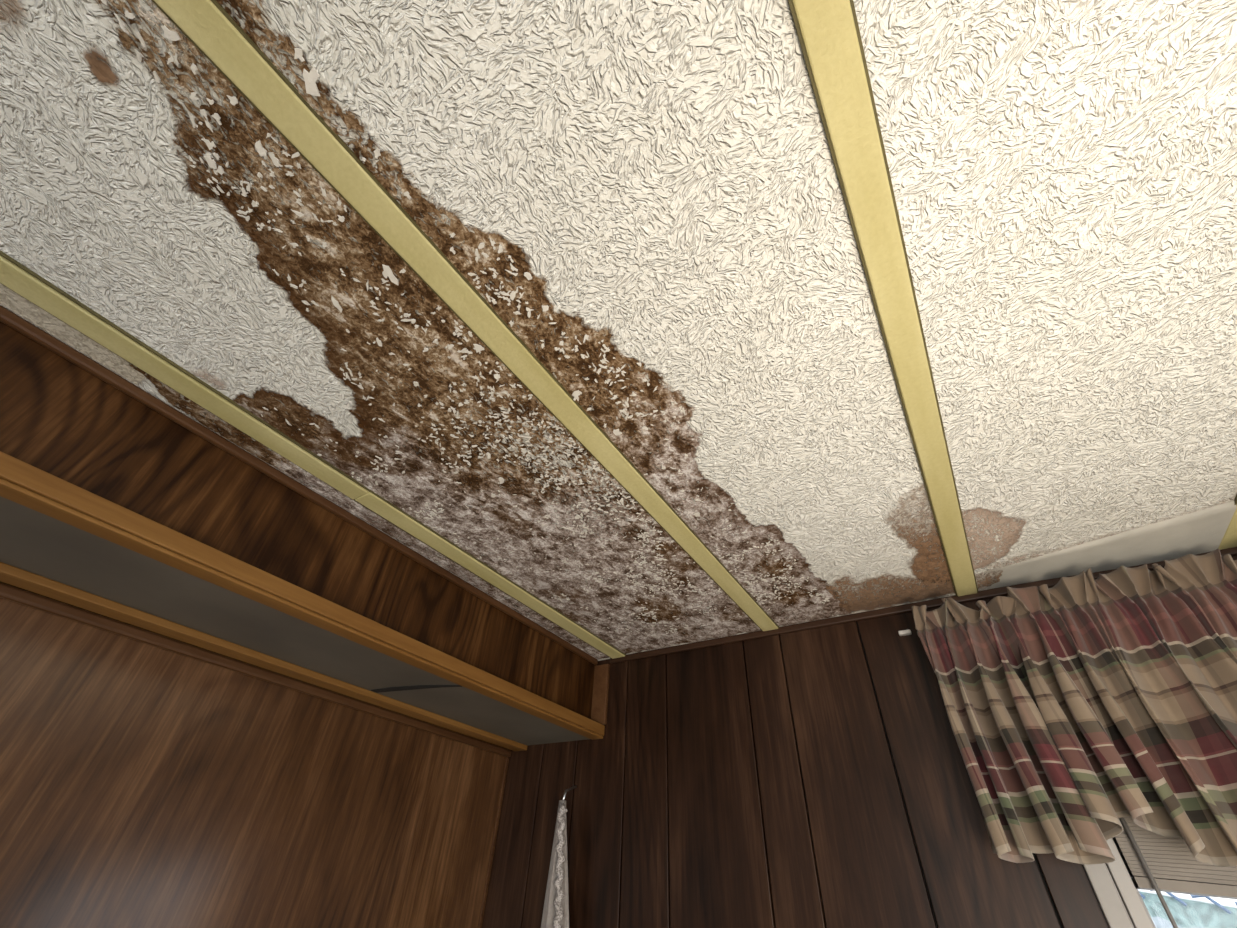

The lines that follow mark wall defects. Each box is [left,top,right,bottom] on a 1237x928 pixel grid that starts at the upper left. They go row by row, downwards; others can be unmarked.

leakage [84,49,117,85]
leakage [95,0,955,659]
leakage [962,508,1042,588]